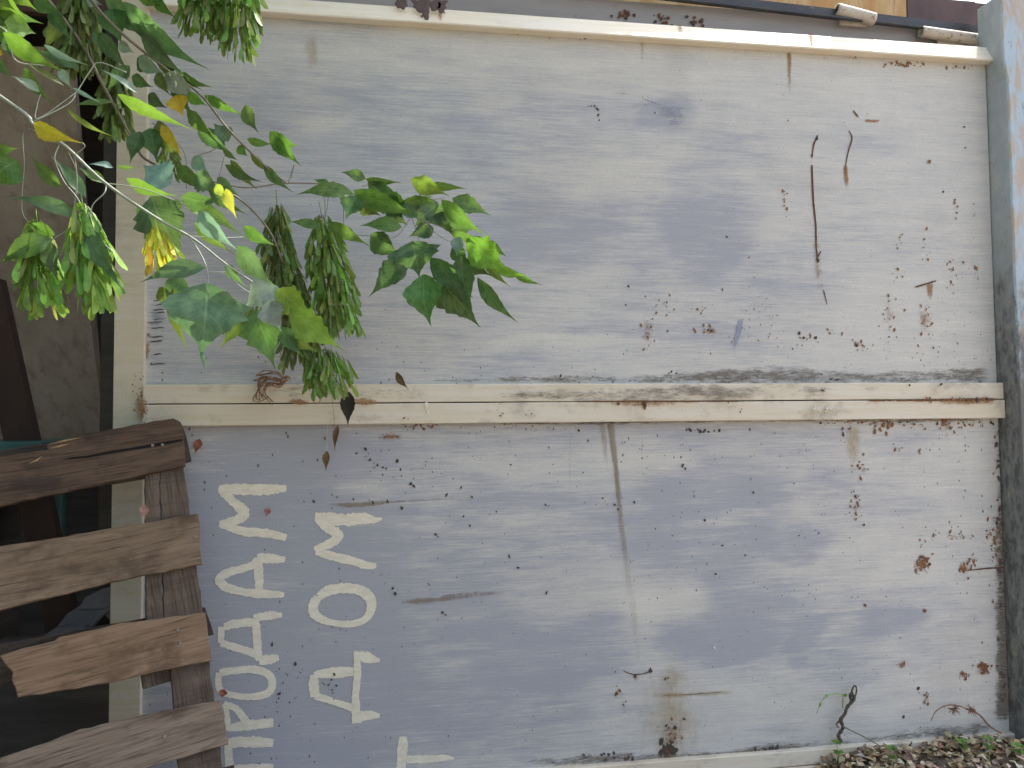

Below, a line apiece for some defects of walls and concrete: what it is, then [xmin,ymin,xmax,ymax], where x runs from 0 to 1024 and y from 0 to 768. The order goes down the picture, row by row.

corrosion [912,259,979,358]
damp [500,373,615,400]
damp [627,368,985,401]
damp [608,424,622,516]
corrosion [914,517,1000,575]
corrosion [960,661,998,681]
corrosion [659,717,686,758]